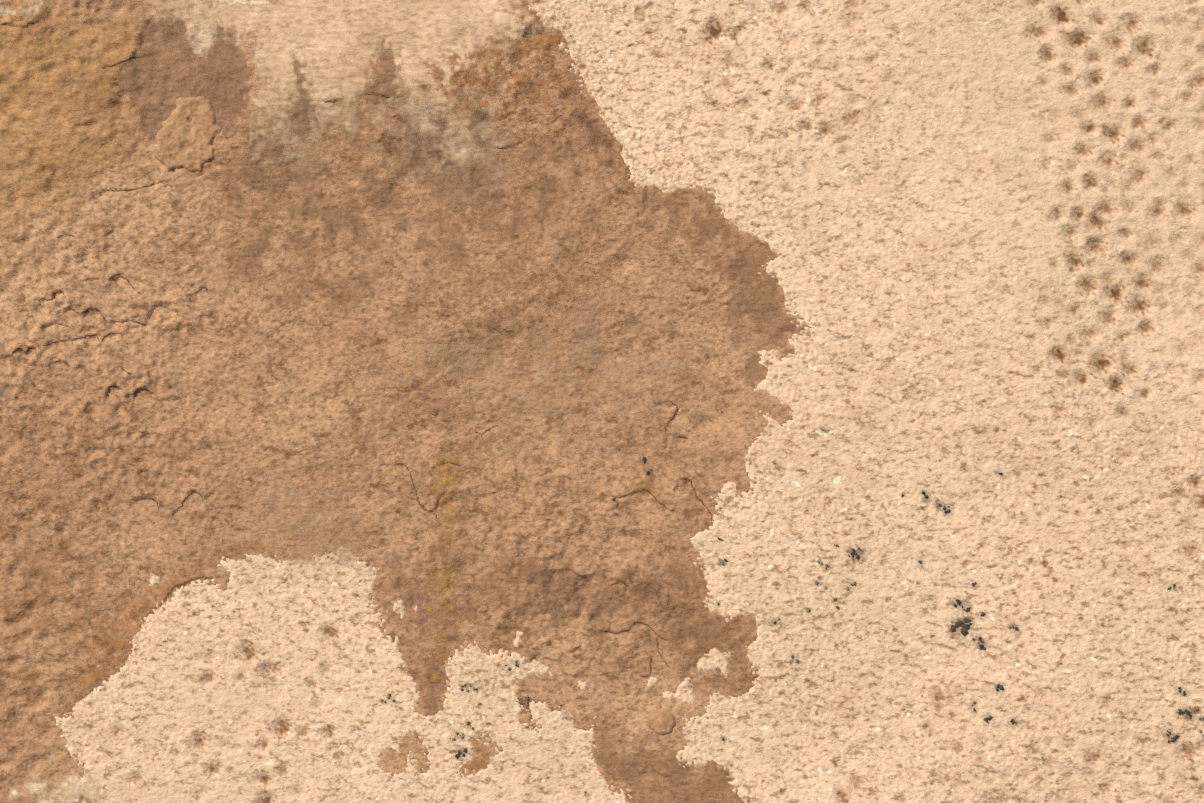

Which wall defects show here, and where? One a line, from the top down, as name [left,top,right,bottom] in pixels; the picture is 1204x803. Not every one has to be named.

damp [366,49,396,103]
damp [225,64,528,269]
damp [667,606,740,658]